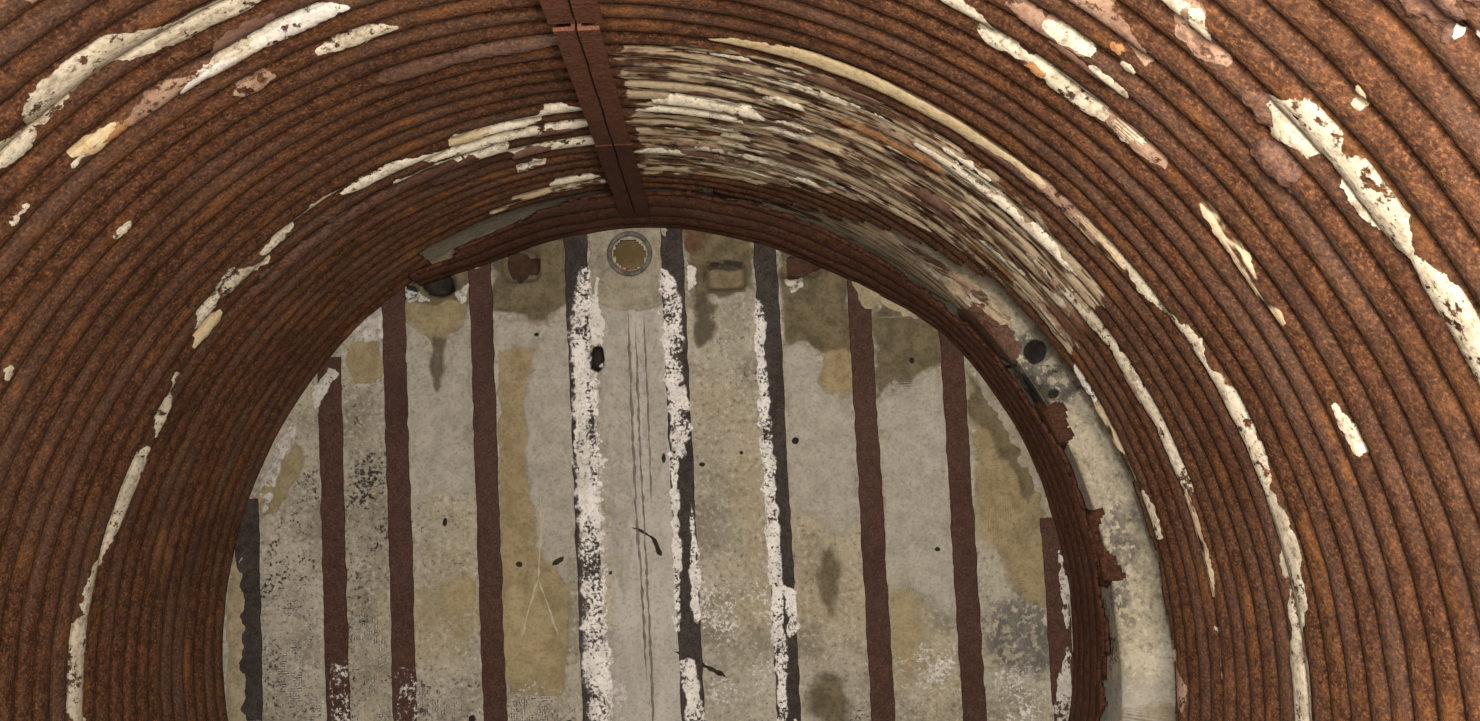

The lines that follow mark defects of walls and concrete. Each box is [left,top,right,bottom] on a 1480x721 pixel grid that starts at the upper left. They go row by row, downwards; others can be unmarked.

peeling [0,0,399,169]
peeling [940,0,1168,169]
peeling [66,372,180,721]
peeling [192,102,606,349]
water stain [405,250,469,390]
water stain [492,230,853,721]
rust [409,190,1126,721]
water stain [892,587,920,669]
water stain [872,305,942,398]
peeling [614,38,1312,721]
peeling [1331,403,1368,457]
peeling [1267,94,1480,385]